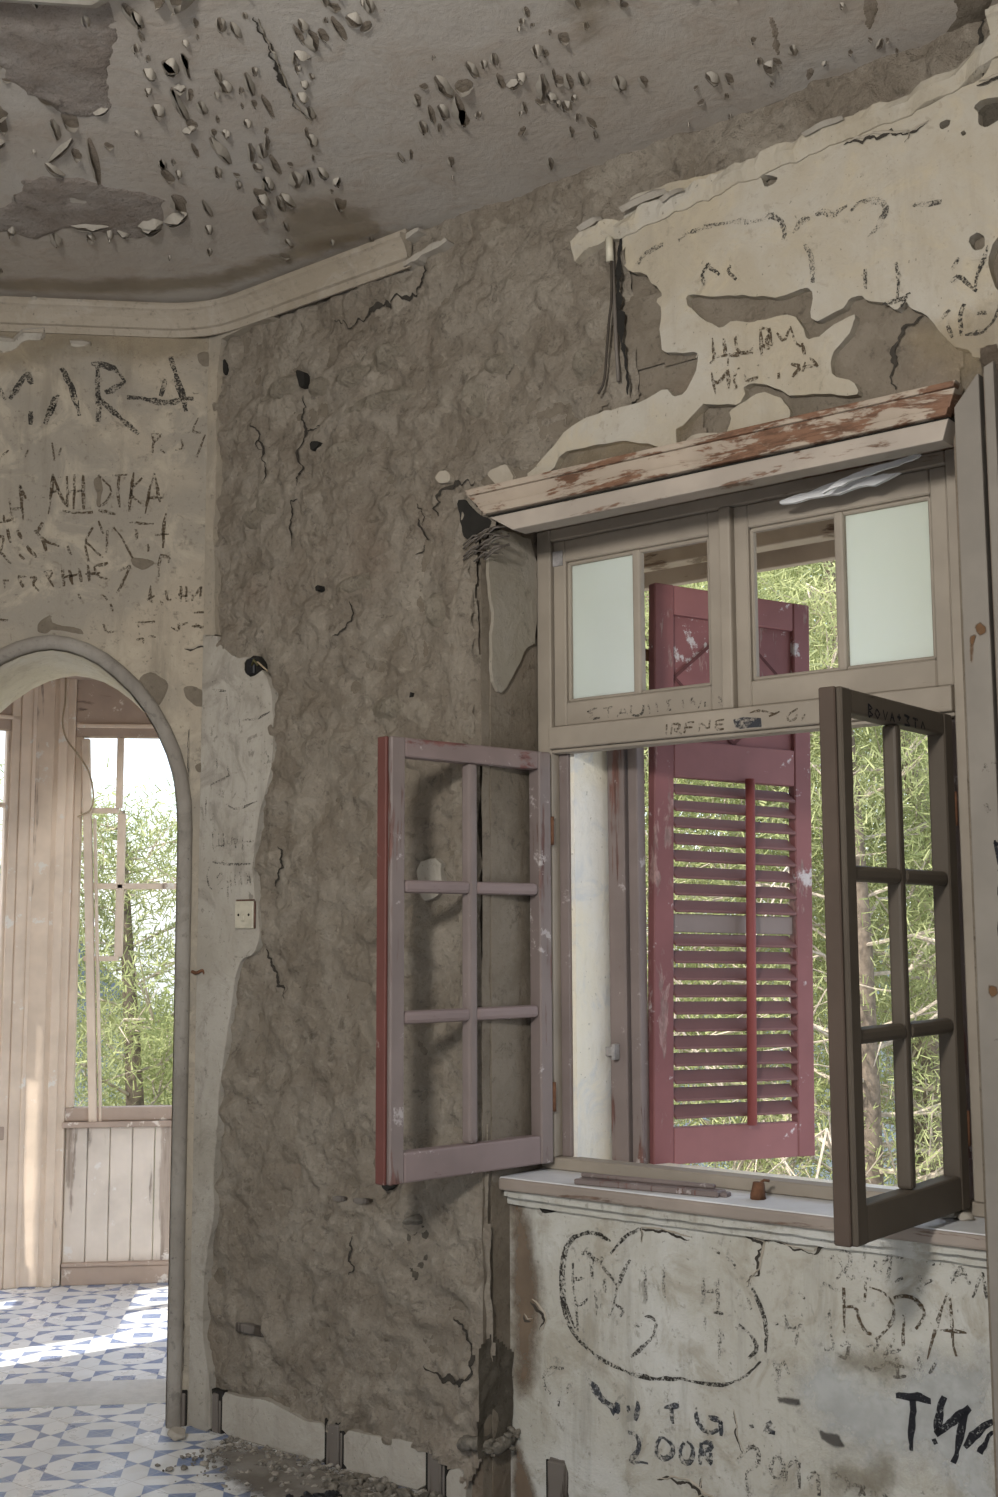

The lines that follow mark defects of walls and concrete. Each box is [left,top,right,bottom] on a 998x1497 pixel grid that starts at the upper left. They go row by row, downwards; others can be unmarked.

peeling [0,0,376,260]
flaking render [979,103,998,127]
crack [334,265,427,329]
crack [889,315,923,390]
flaking render [197,0,992,1497]
crack [423,1318,475,1388]
crack [657,1475,714,1497]